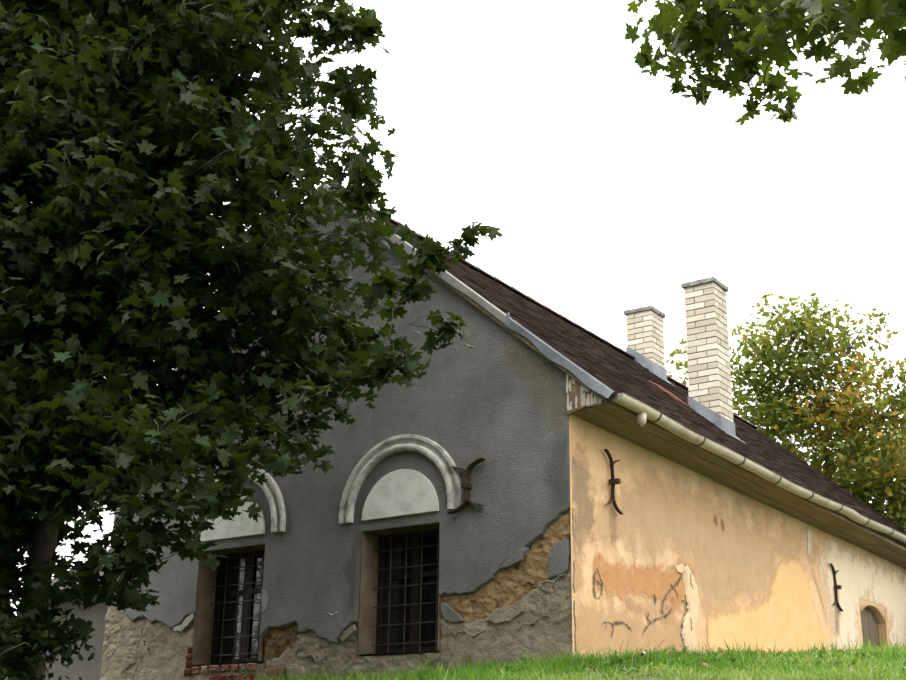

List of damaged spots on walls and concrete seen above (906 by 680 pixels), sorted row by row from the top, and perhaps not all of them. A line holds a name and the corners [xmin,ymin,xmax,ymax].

spalling [100,508,577,680]
crack [593,568,604,599]
crack [602,575,687,640]
water stain [572,458,906,651]